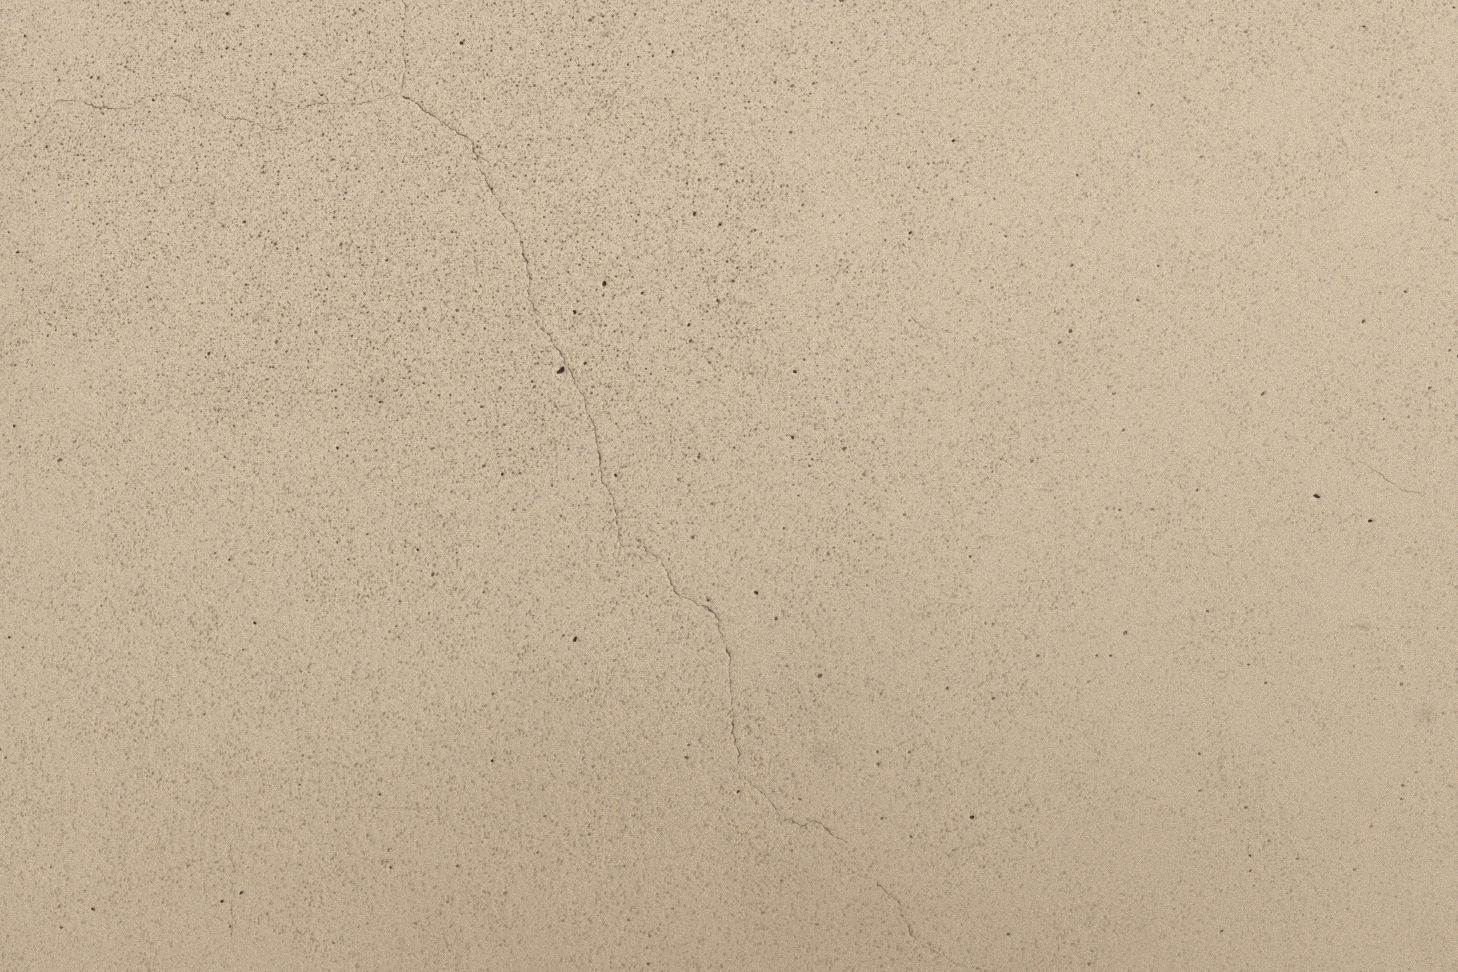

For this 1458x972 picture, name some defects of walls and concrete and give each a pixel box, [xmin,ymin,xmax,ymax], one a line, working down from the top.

crack [0,0,986,970]